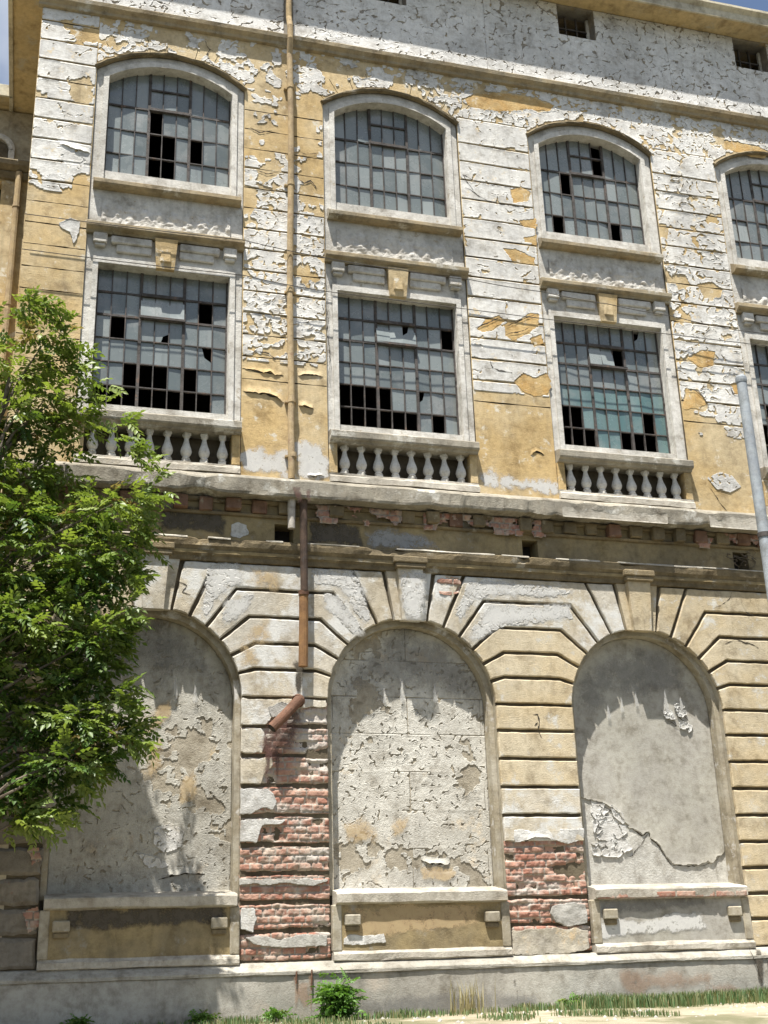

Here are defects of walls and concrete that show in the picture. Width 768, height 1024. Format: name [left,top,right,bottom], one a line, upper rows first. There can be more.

peeling [28,0,768,439]
peeling [708,472,741,492]
flaking render [314,504,402,526]
flaking render [423,513,546,538]
spalling [562,506,668,524]
spalling [697,515,759,549]
peeling [27,562,747,961]
crack [626,831,719,867]